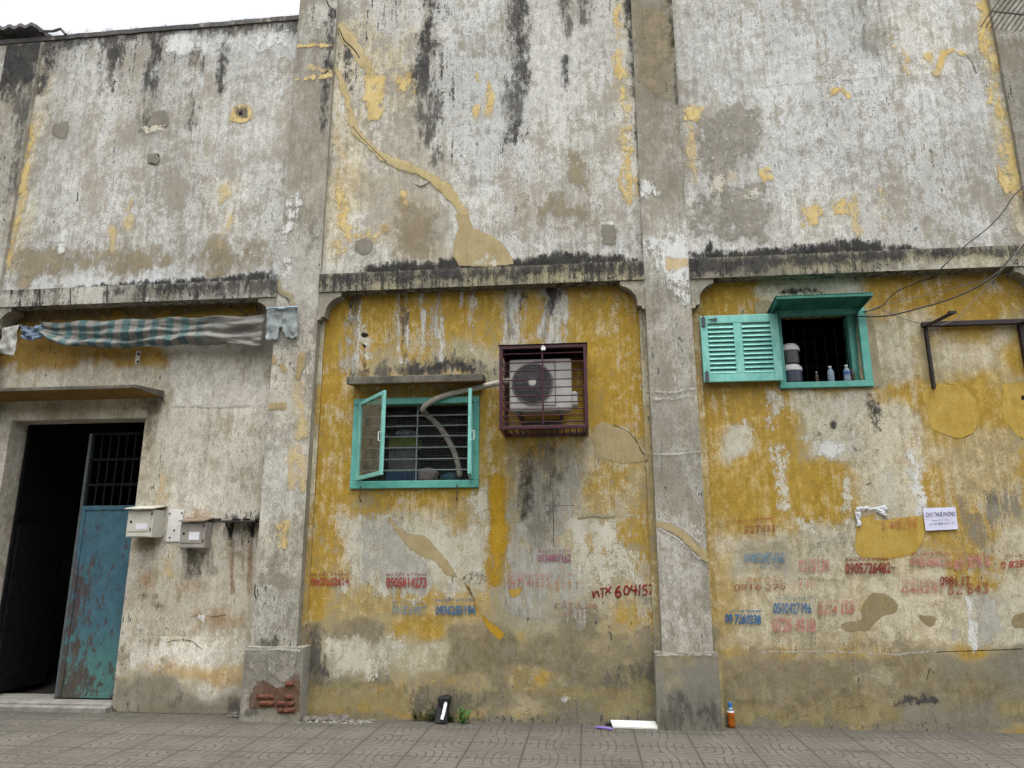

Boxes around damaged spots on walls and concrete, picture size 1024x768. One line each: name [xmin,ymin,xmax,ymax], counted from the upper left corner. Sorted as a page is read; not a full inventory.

damp [0,18,298,192]
spalling [230,104,253,123]
damp [409,0,443,166]
peeling [471,71,495,121]
damp [502,0,532,144]
damp [9,233,277,295]
peeling [329,126,392,256]
damp [319,197,644,377]
damp [688,187,1024,275]
peeling [337,458,647,628]
spalling [244,652,301,713]